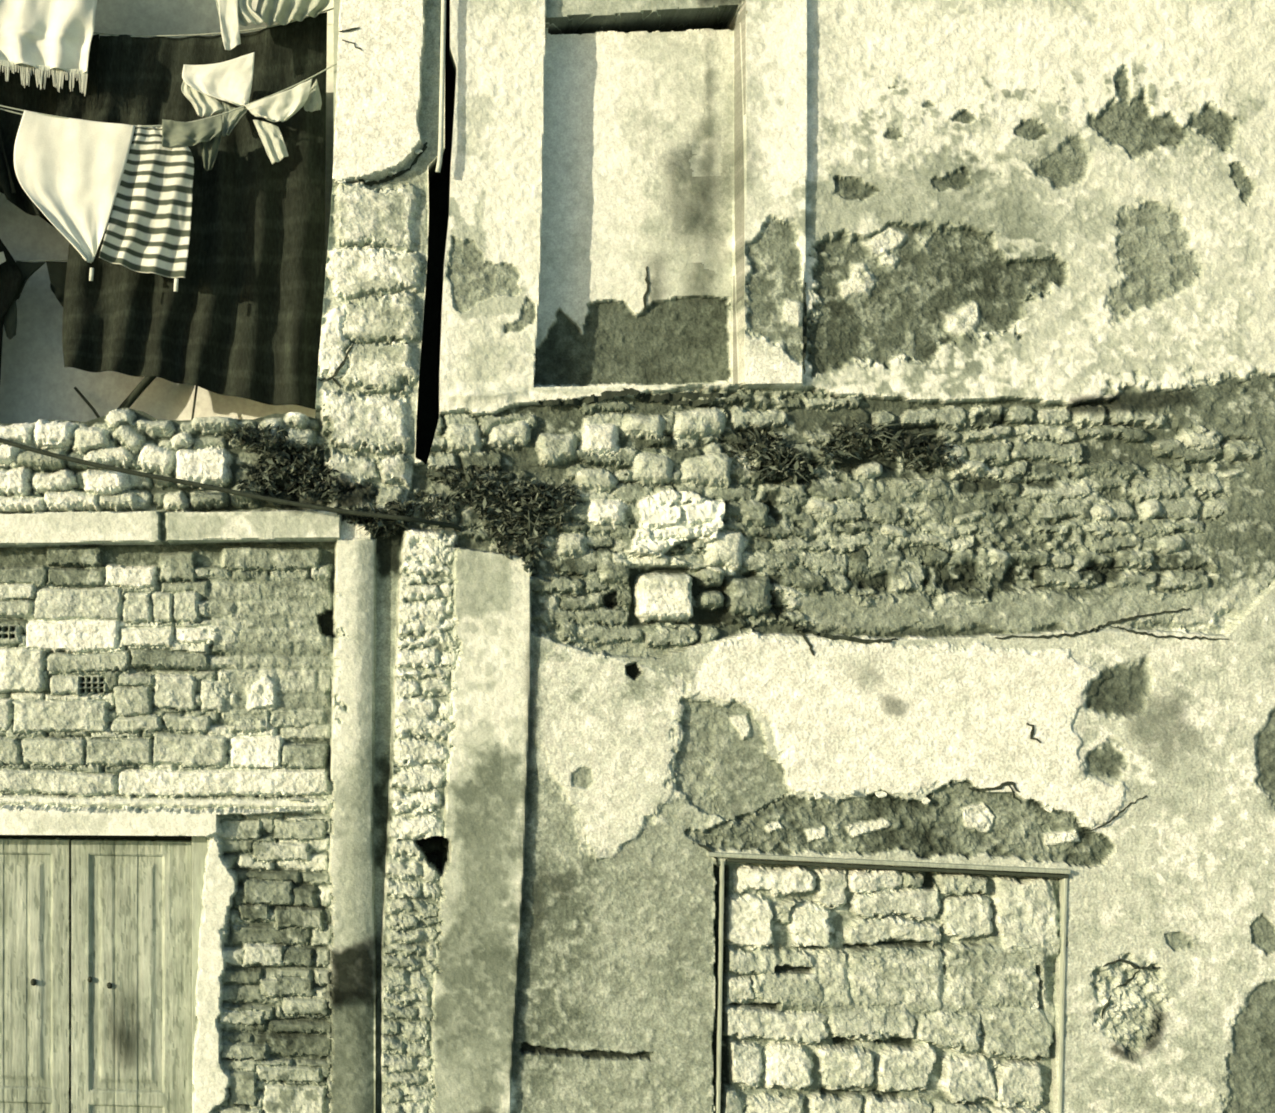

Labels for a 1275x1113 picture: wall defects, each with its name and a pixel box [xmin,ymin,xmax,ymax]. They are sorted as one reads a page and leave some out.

spalling [1013,118,1050,140]
spalling [1030,66,1256,204]
spalling [447,237,537,333]
crack [642,266,650,311]
spalling [534,217,1068,388]
spalling [1106,200,1203,323]
crack [780,614,898,655]
crack [995,608,1229,640]
crack [1026,723,1041,743]
spalling [675,698,1117,869]